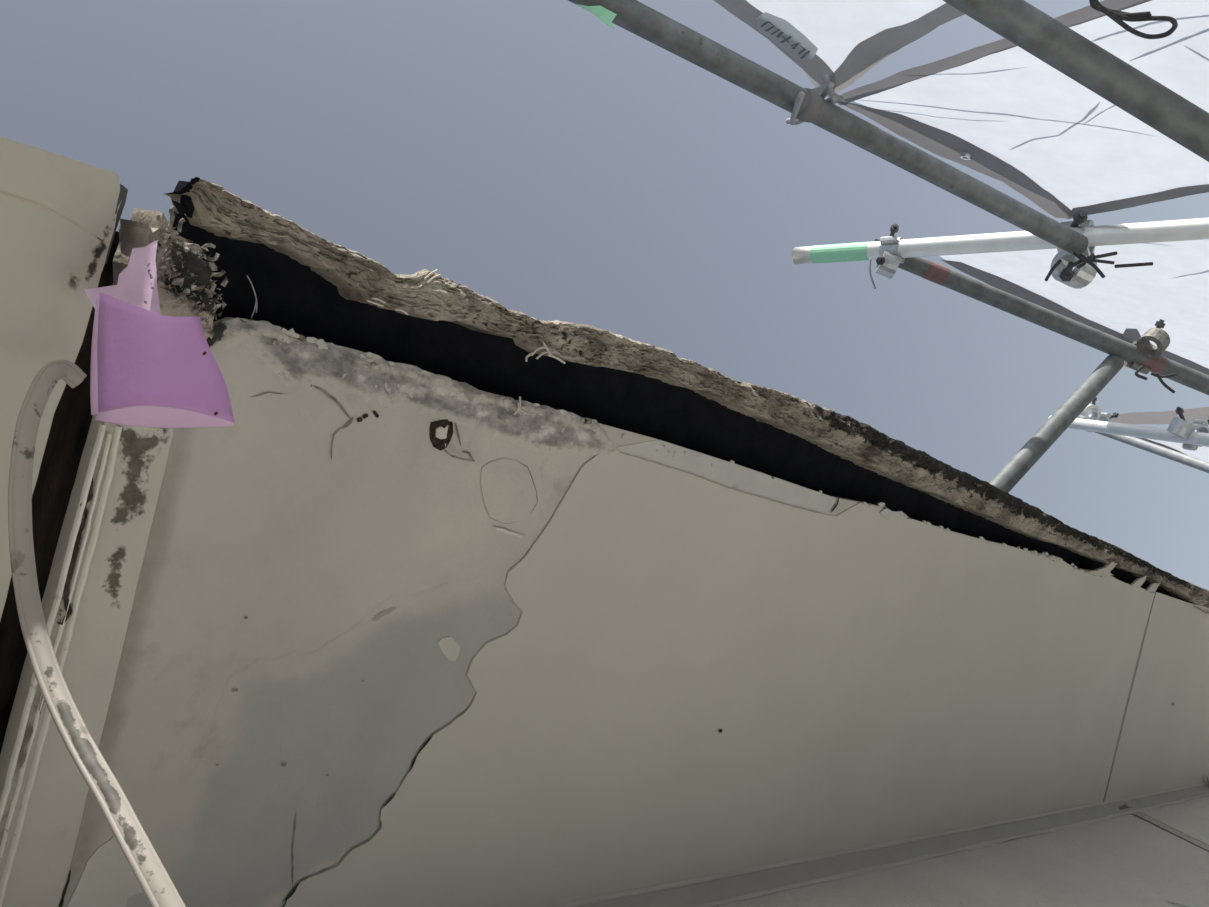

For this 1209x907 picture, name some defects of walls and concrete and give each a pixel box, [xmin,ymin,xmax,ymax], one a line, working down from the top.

spalling [862,502,908,522]
peeling [57,478,94,625]
peeling [99,206,839,907]
spalling [979,536,1117,577]
spalling [1130,576,1161,593]
peeling [20,696,45,768]
peeling [62,789,113,907]